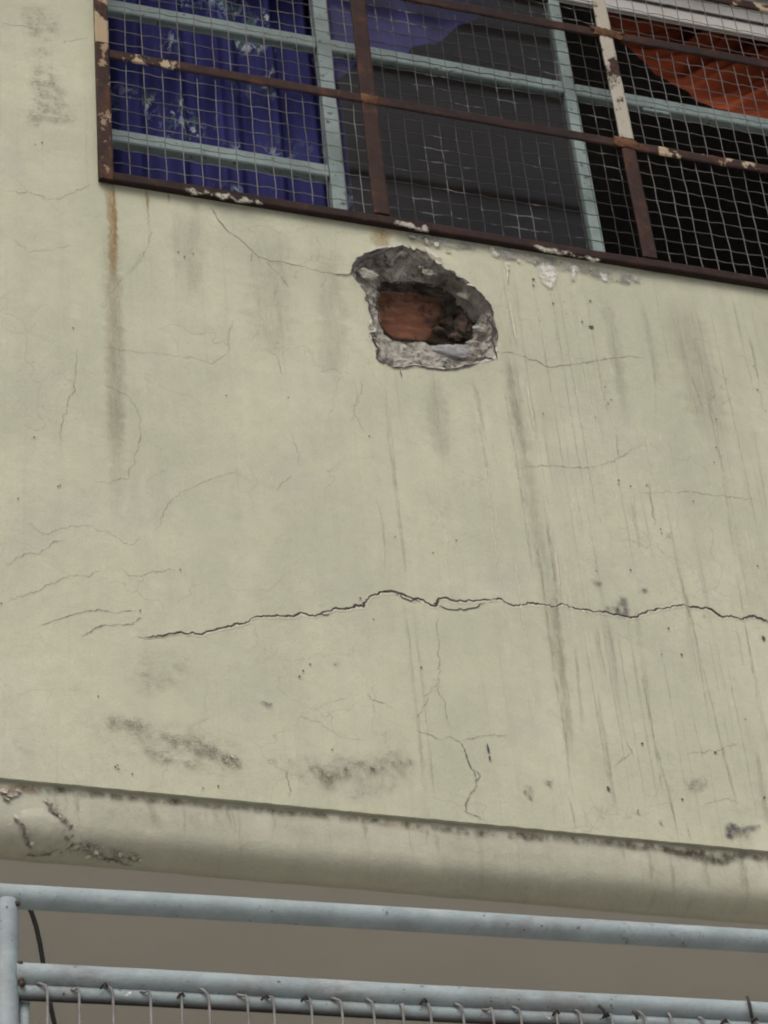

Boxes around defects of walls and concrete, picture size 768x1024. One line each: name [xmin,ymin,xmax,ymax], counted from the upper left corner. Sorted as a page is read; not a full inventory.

spalling [334,220,498,377]
crack [138,590,768,639]
peeling [14,797,142,863]